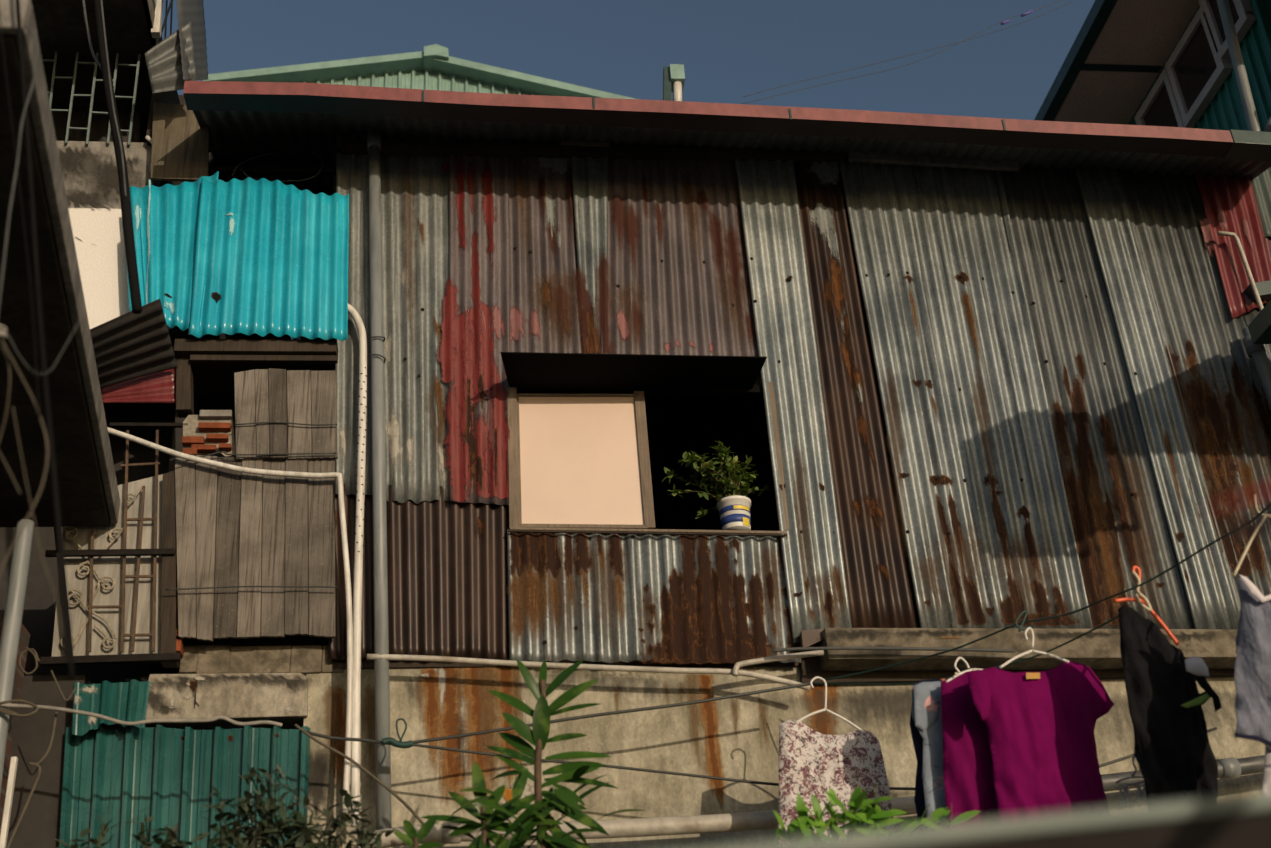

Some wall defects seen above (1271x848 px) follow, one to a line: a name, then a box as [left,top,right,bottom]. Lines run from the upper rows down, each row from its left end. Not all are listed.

peeling [437,140,541,502]
rust [538,164,574,254]
rust [540,256,614,354]
rust [698,189,757,344]
rust [823,256,877,468]
rust [930,353,1141,638]
rust [1165,339,1271,586]
rust [417,667,522,801]
rust [509,532,625,641]
rust [639,535,810,807]
rust [805,685,838,735]
rust [810,566,843,628]